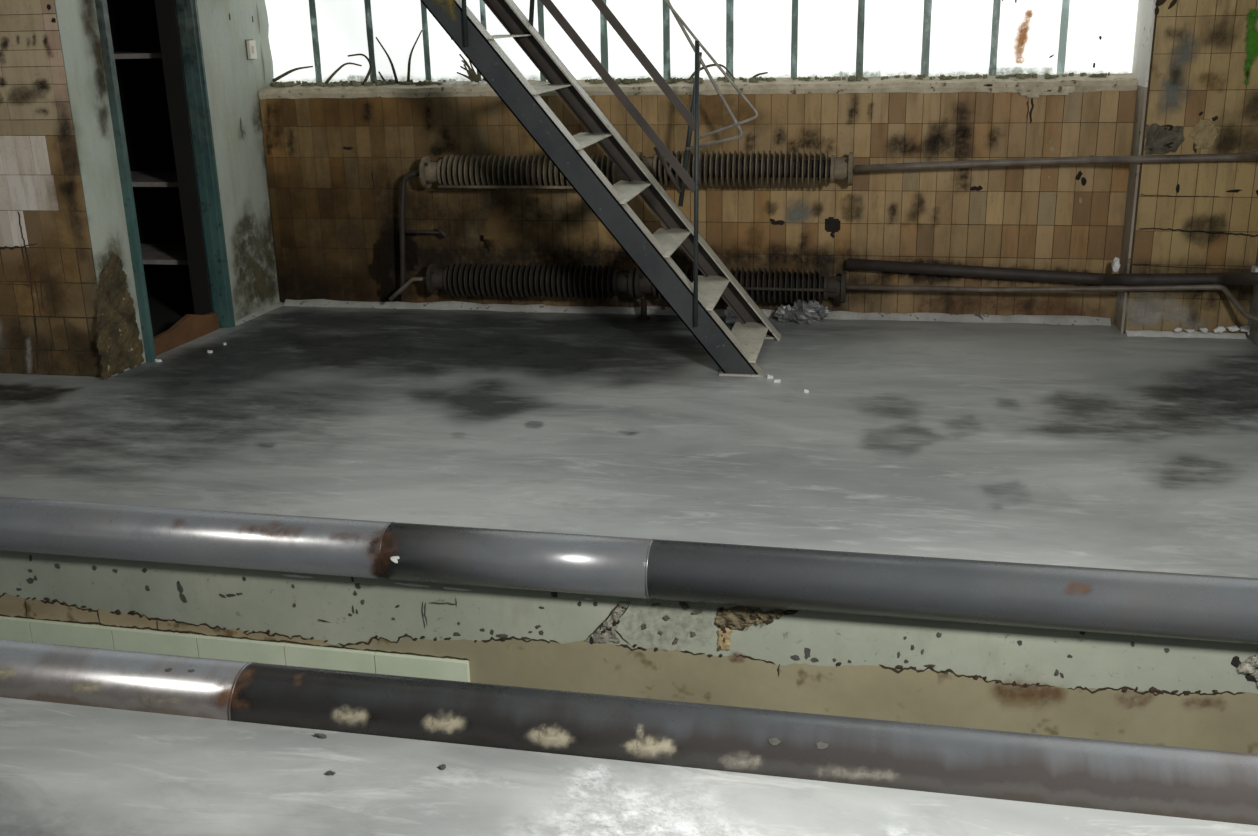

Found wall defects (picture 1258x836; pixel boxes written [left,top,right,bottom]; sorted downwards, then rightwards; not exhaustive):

leakage [128,215,705,394]
leakage [420,382,533,418]
leakage [1041,356,1258,433]
spalling [0,550,1258,756]